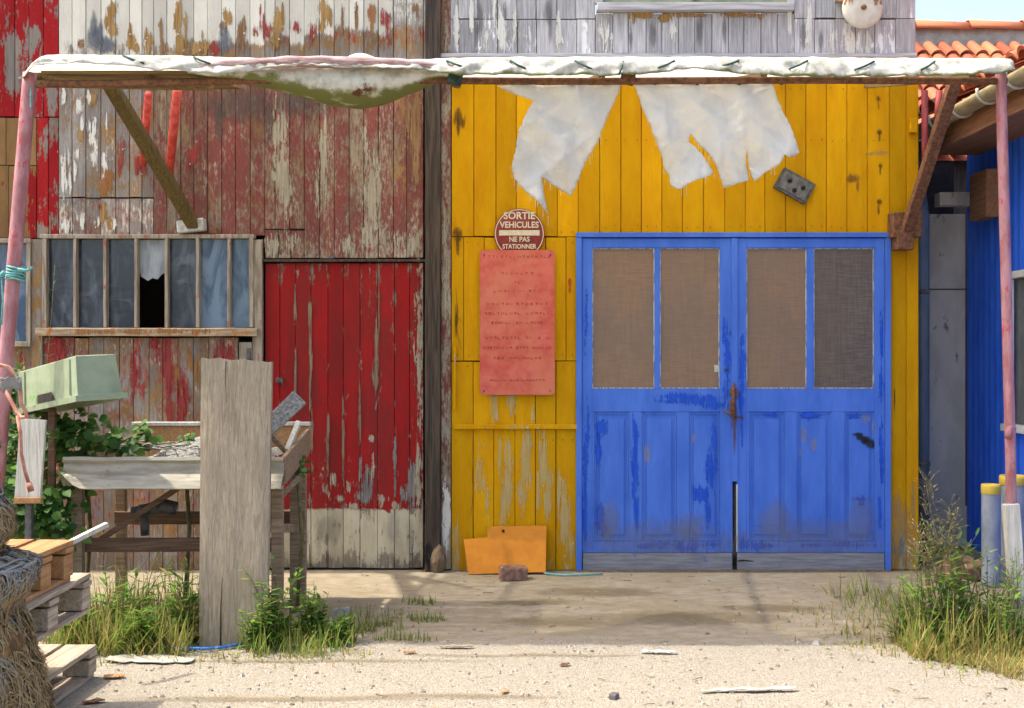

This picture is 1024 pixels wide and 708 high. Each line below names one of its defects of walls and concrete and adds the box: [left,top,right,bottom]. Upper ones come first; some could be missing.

peeling [104,0,220,56]
peeling [219,0,358,51]
peeling [380,8,391,45]
peeling [60,88,147,234]
peeling [264,94,301,258]
peeling [315,103,329,220]
peeling [405,92,422,189]
peeling [339,125,423,430]
peeling [150,336,198,422]
peeling [293,280,422,523]
peeling [475,395,608,561]
peeling [655,318,746,530]